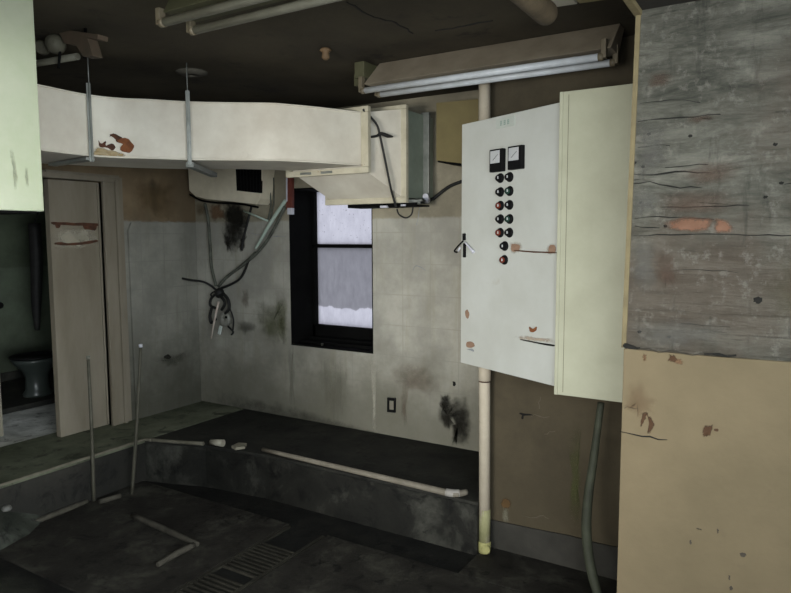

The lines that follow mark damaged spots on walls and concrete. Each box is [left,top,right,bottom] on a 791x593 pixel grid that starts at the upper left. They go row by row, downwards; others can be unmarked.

spalling [664,218,731,232]
damp [441,396,468,441]
crack [620,431,667,440]